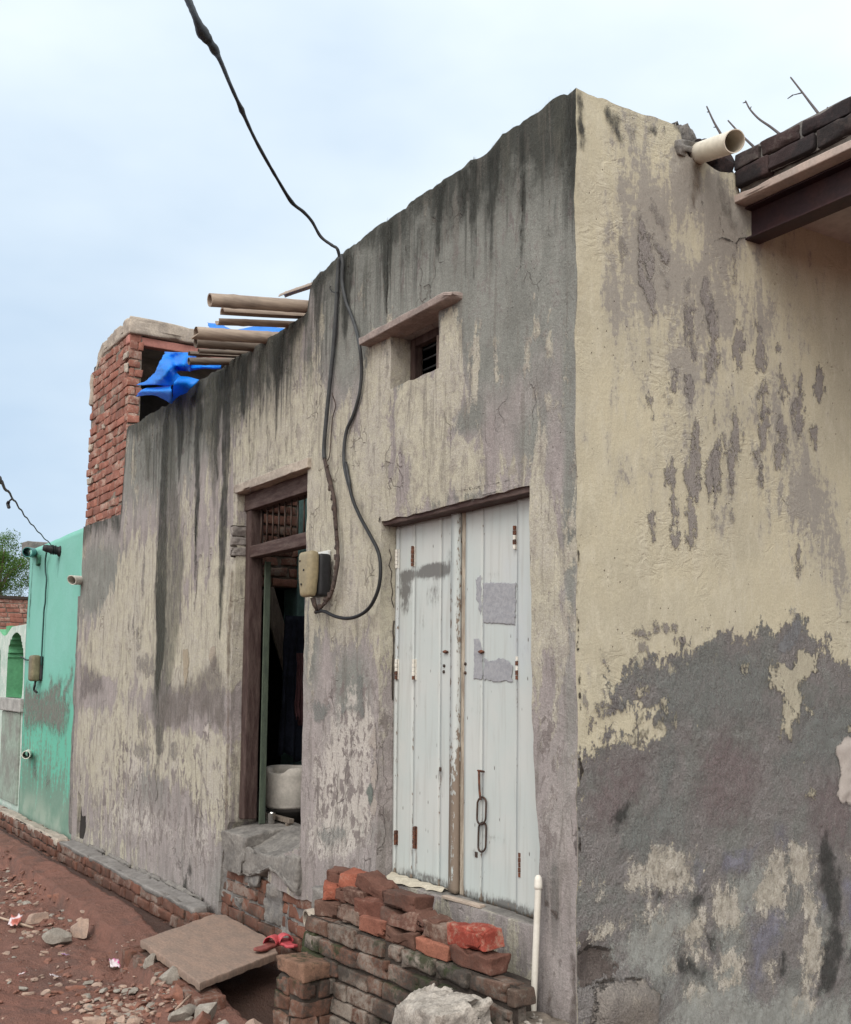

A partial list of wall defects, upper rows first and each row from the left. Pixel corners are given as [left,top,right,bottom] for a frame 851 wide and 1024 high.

leakage [555,96,584,193]
leakage [604,107,622,142]
leakage [458,137,523,254]
leakage [311,272,323,315]
leakage [342,252,354,333]
leakage [380,220,392,310]
peeling [619,197,670,321]
peeling [645,273,827,551]
leakage [145,355,249,739]
peeling [632,619,687,661]
peeling [581,690,627,747]
spalling [577,929,619,988]